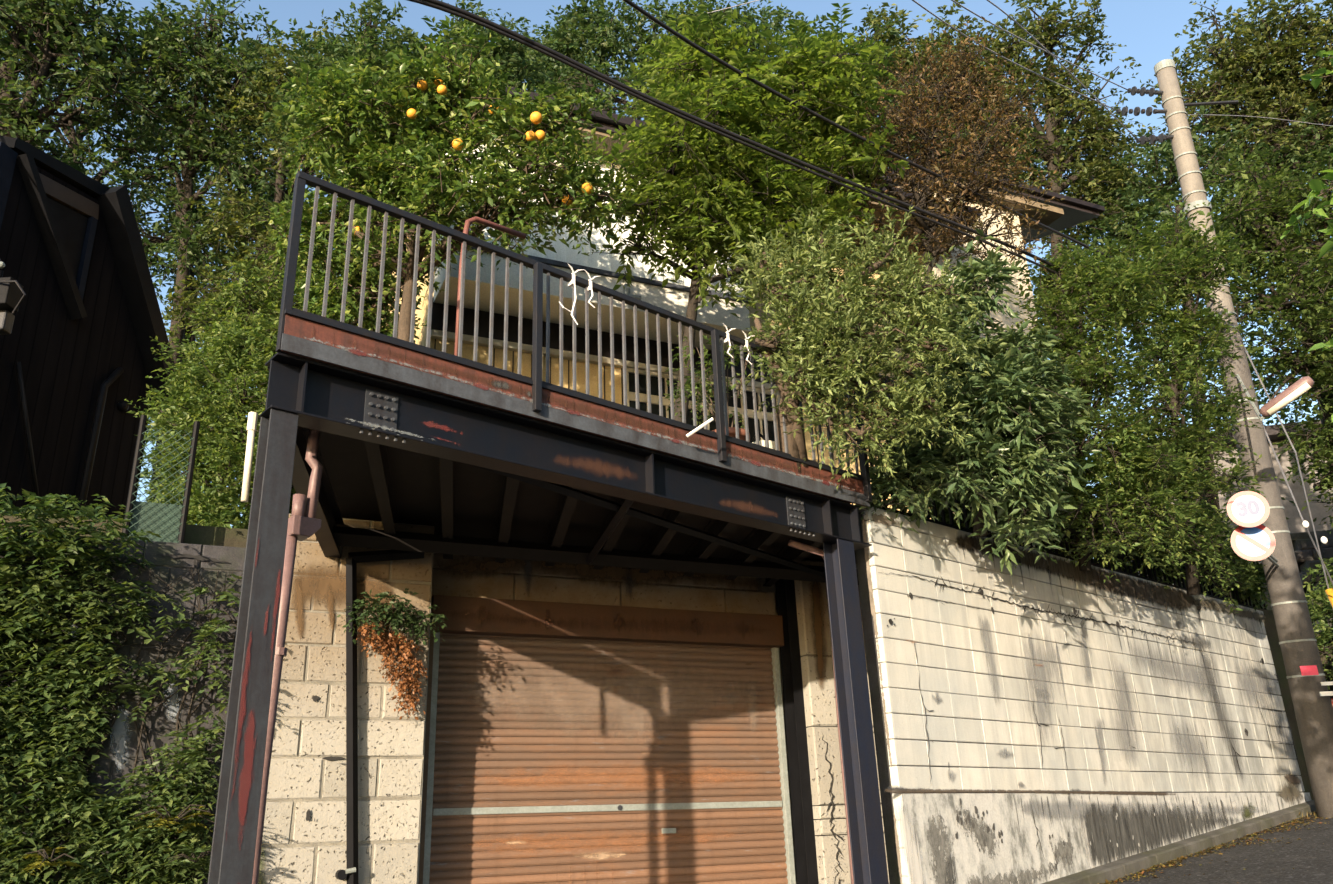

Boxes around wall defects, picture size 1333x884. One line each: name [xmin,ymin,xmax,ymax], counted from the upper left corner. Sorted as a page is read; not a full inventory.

rust [396,354,815,476]
damp [810,582,826,686]
damp [945,535,1266,772]
crack [822,733,844,884]
damp [885,718,1306,884]